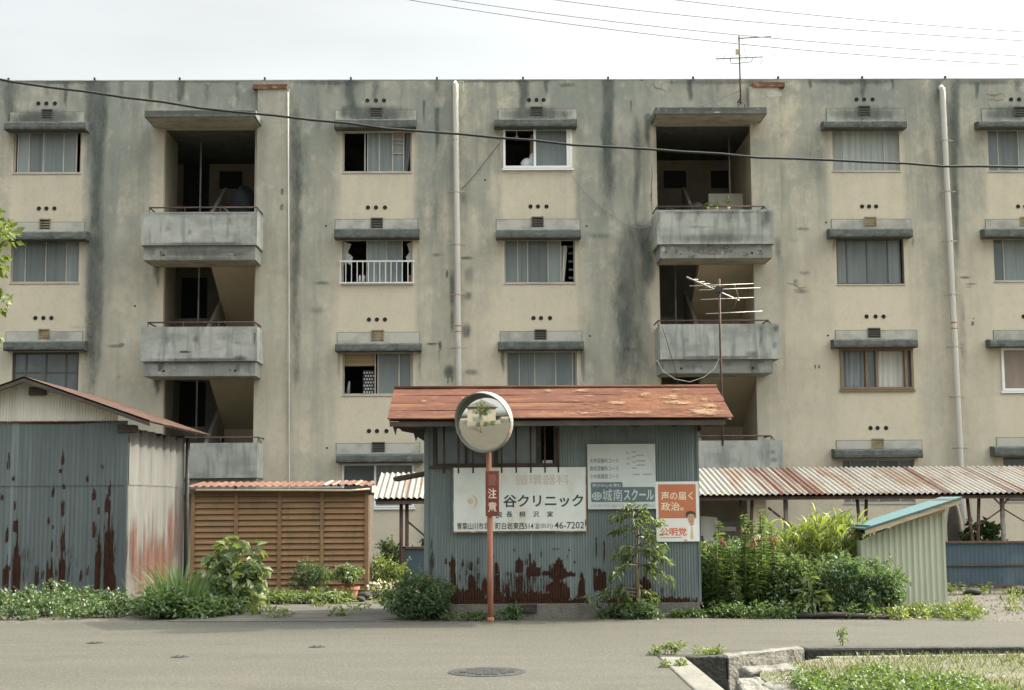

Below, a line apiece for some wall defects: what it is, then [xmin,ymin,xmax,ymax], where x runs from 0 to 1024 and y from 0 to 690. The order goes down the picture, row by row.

leakage [87,81,106,211]
leakage [603,80,613,178]
leakage [89,234,102,354]
leakage [621,228,732,344]
corrosion [584,390,723,415]
corrosion [0,451,118,598]
corrosion [130,504,182,593]
corrosion [430,538,698,604]